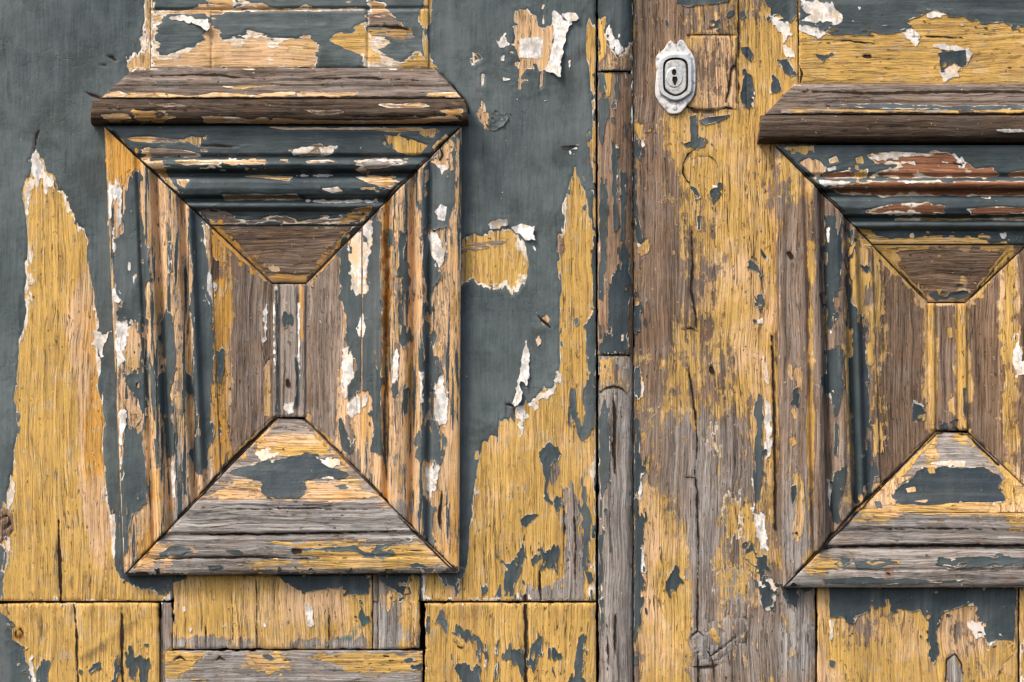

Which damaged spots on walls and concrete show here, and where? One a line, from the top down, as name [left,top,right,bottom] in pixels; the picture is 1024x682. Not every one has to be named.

peeling [676,0,746,31]
peeling [765,0,1024,96]
peeling [681,47,761,151]
peeling [689,182,722,208]
peeling [747,248,768,277]
peeling [753,293,764,324]
peeling [0,0,654,682]
peeling [784,146,1024,523]
peeling [702,420,722,457]
peeling [710,356,1024,682]
peeling [662,565,685,597]